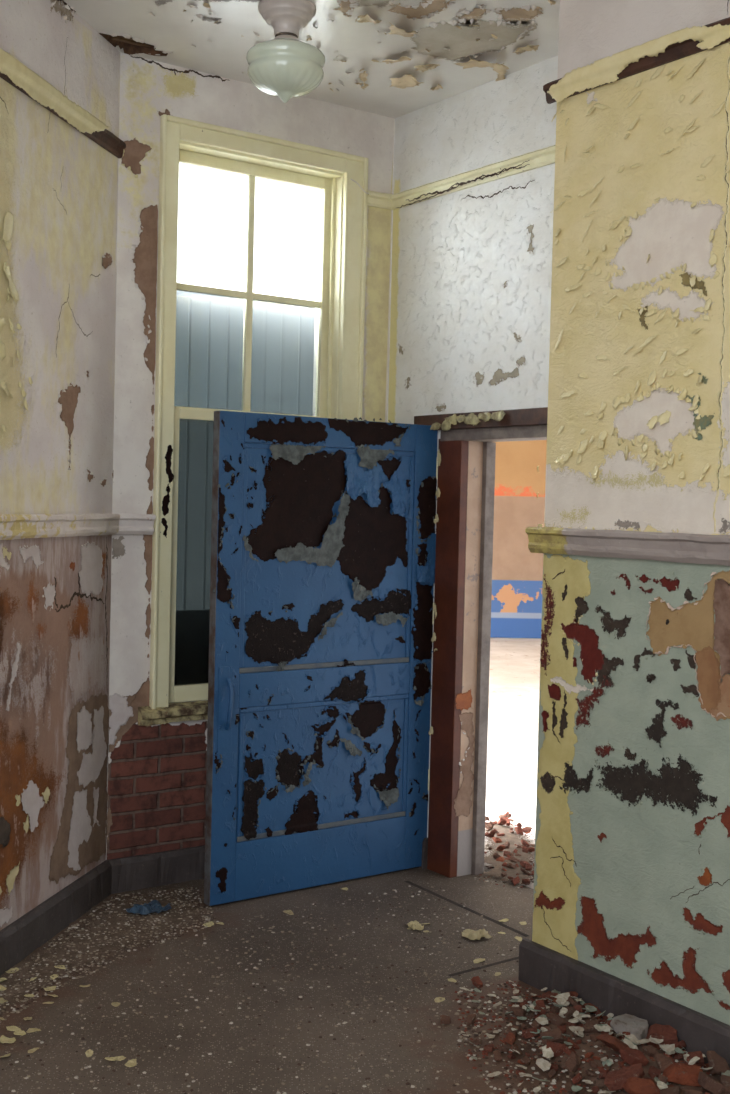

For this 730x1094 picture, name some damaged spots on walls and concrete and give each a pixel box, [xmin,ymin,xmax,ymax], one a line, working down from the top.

crack [131,56,230,82]
peeling [307,0,560,91]
peeling [550,177,724,376]
spalling [58,370,90,470]
spalling [129,204,174,658]
spalling [473,355,525,387]
peeling [537,348,730,535]
crack [54,544,108,694]
flaking render [49,672,223,884]
spalling [540,570,730,838]
peeling [577,896,730,1011]
crack [670,879,730,903]